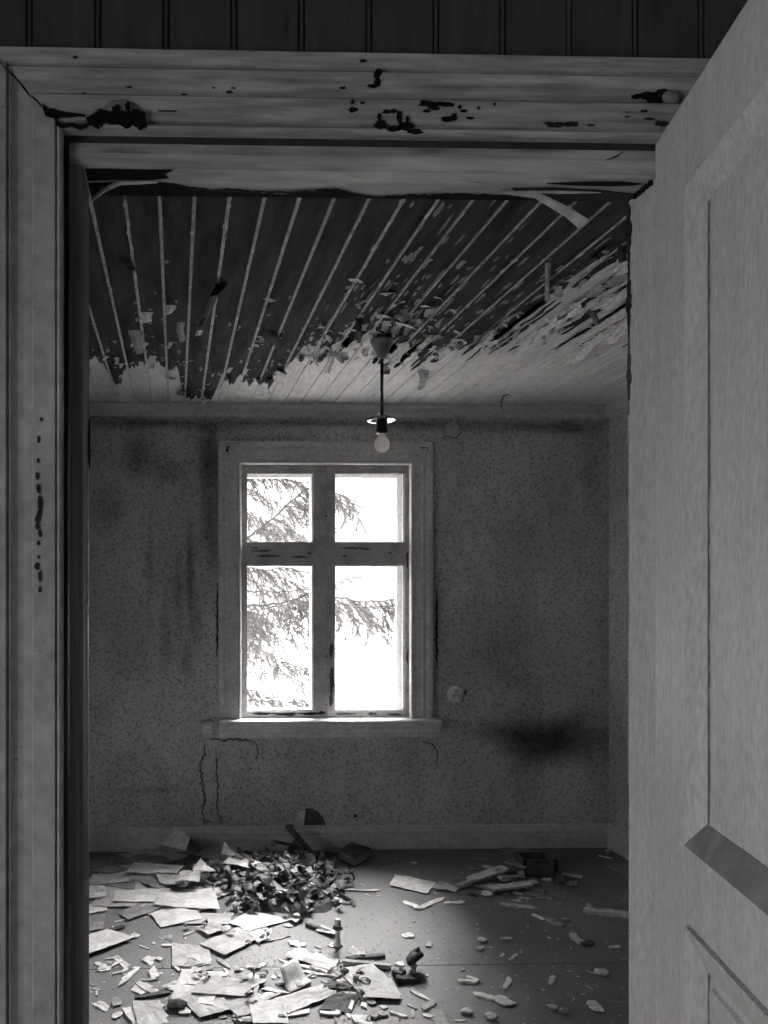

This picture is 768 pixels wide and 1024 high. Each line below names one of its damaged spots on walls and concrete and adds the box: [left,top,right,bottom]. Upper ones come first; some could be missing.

peeling [360,59,382,88]
peeling [373,109,424,135]
peeling [625,109,670,127]
peeling [85,168,653,414]
peeling [34,458,43,593]